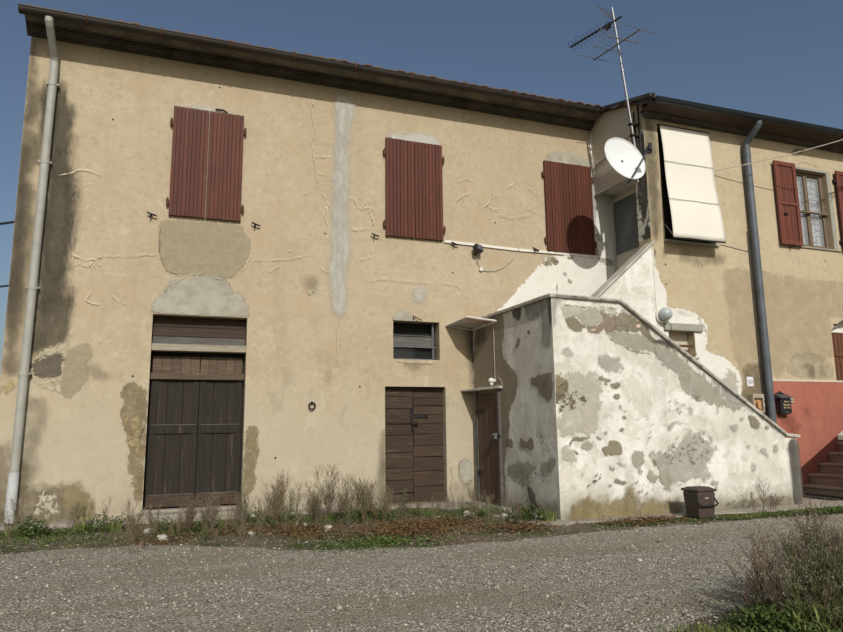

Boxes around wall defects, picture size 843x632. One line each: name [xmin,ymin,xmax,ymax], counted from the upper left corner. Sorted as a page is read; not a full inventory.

damp [0,79,75,395]
crack [70,253,155,266]
flaking render [30,343,69,393]
flaking render [120,375,148,501]
peeling [473,315,720,503]
peeling [561,304,769,431]
damp [570,489,682,520]